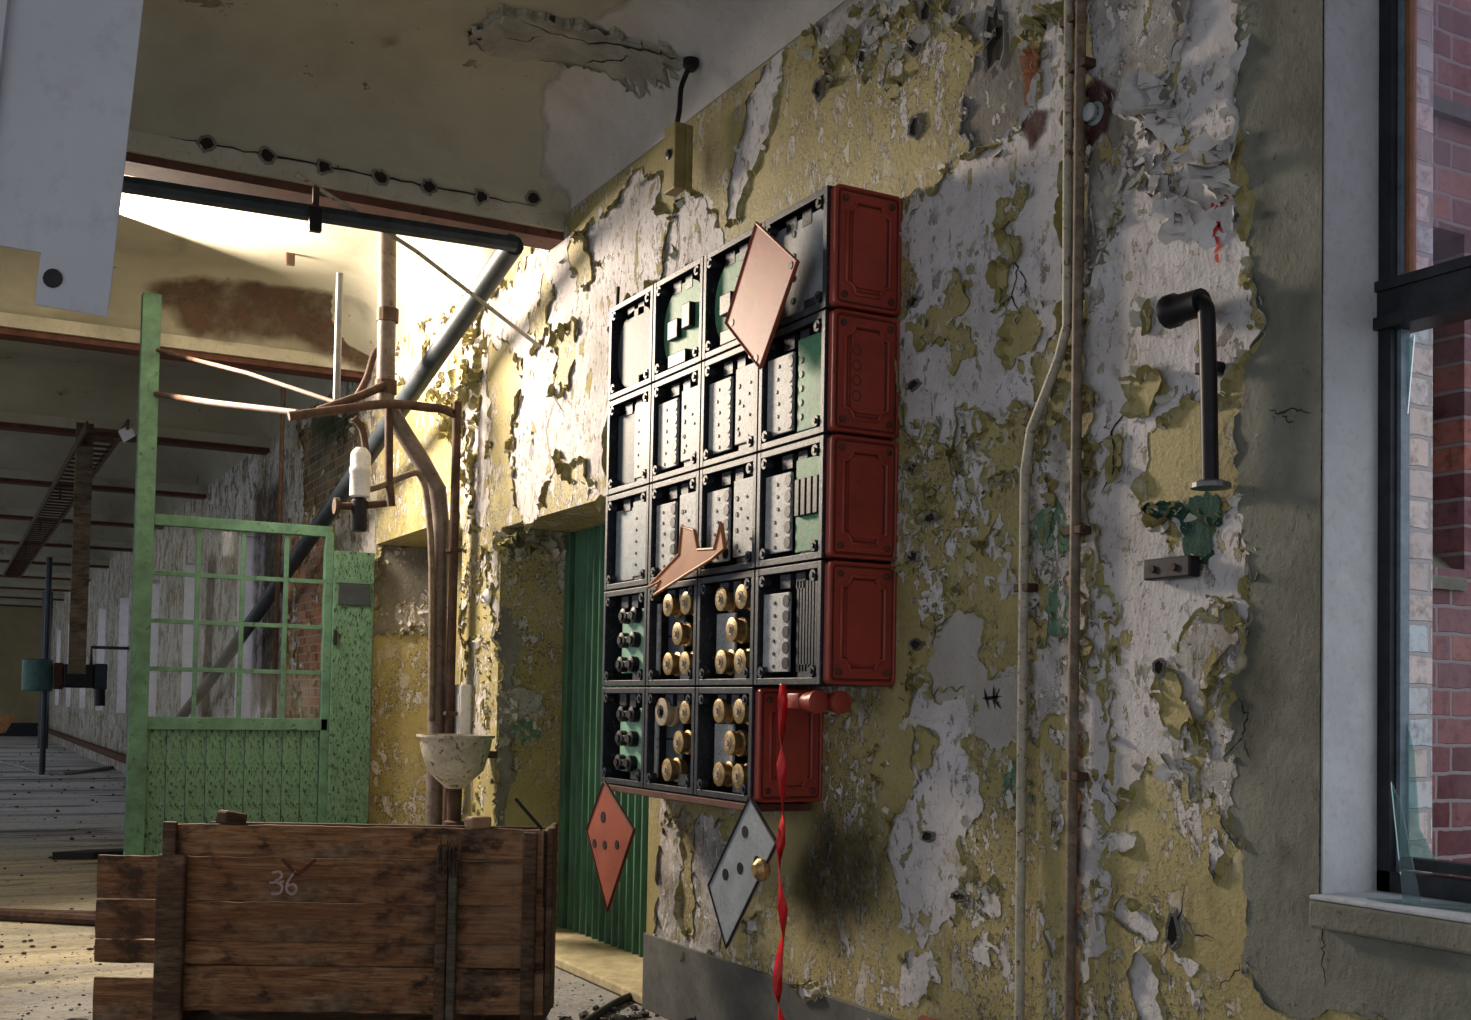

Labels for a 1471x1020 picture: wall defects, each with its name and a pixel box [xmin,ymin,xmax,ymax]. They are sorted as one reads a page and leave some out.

leakage [153,278,370,368]
peeling [395,287,470,386]
peeling [418,0,1265,1020]